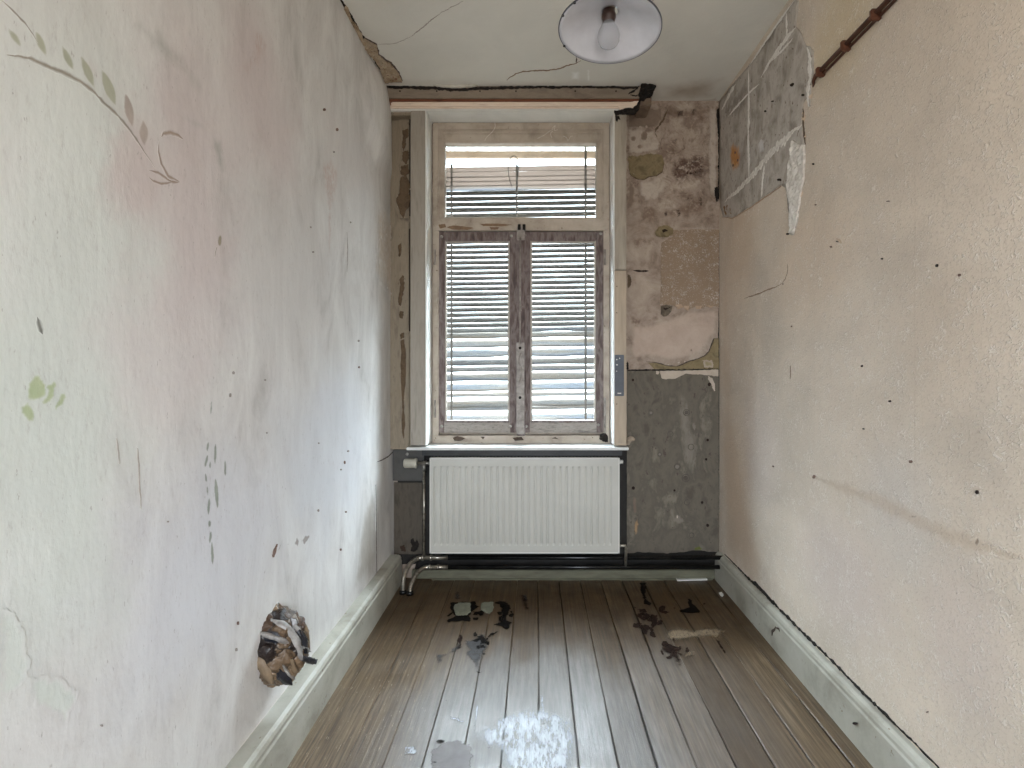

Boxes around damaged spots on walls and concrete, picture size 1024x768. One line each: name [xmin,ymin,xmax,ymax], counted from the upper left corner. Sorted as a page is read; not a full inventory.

flaking render [344,6,403,83]
crack [340,0,636,92]
flaking render [627,107,668,210]
leakage [629,72,733,252]
flaking render [708,0,814,235]
flaking render [654,225,673,237]
flaking render [630,305,719,391]